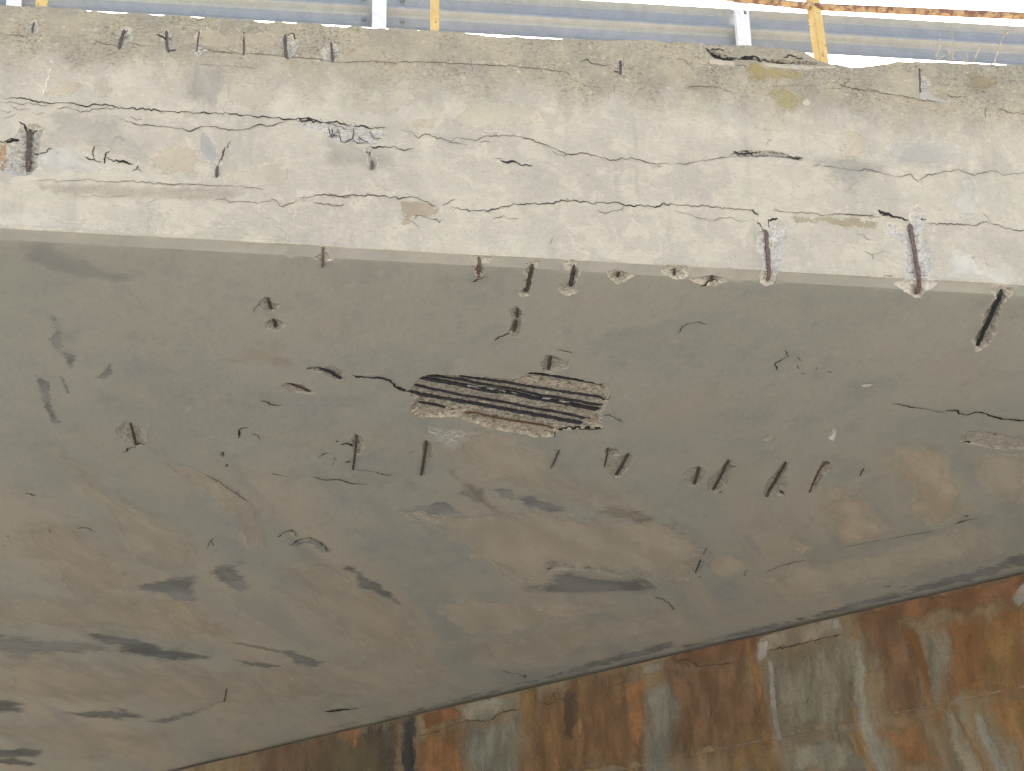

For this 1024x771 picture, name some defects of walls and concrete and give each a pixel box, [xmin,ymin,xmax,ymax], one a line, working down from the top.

spalling [0,121,51,177]
crack [1,97,891,277]
crack [402,129,1024,182]
spalling [878,204,938,298]
crack [353,375,409,392]
spalling [406,354,622,468]
leakage [140,577,195,601]
leakage [213,561,245,590]
leakage [345,567,399,604]
corrosion [860,574,1024,716]
corrosion [519,671,645,771]
corrosion [665,637,772,759]